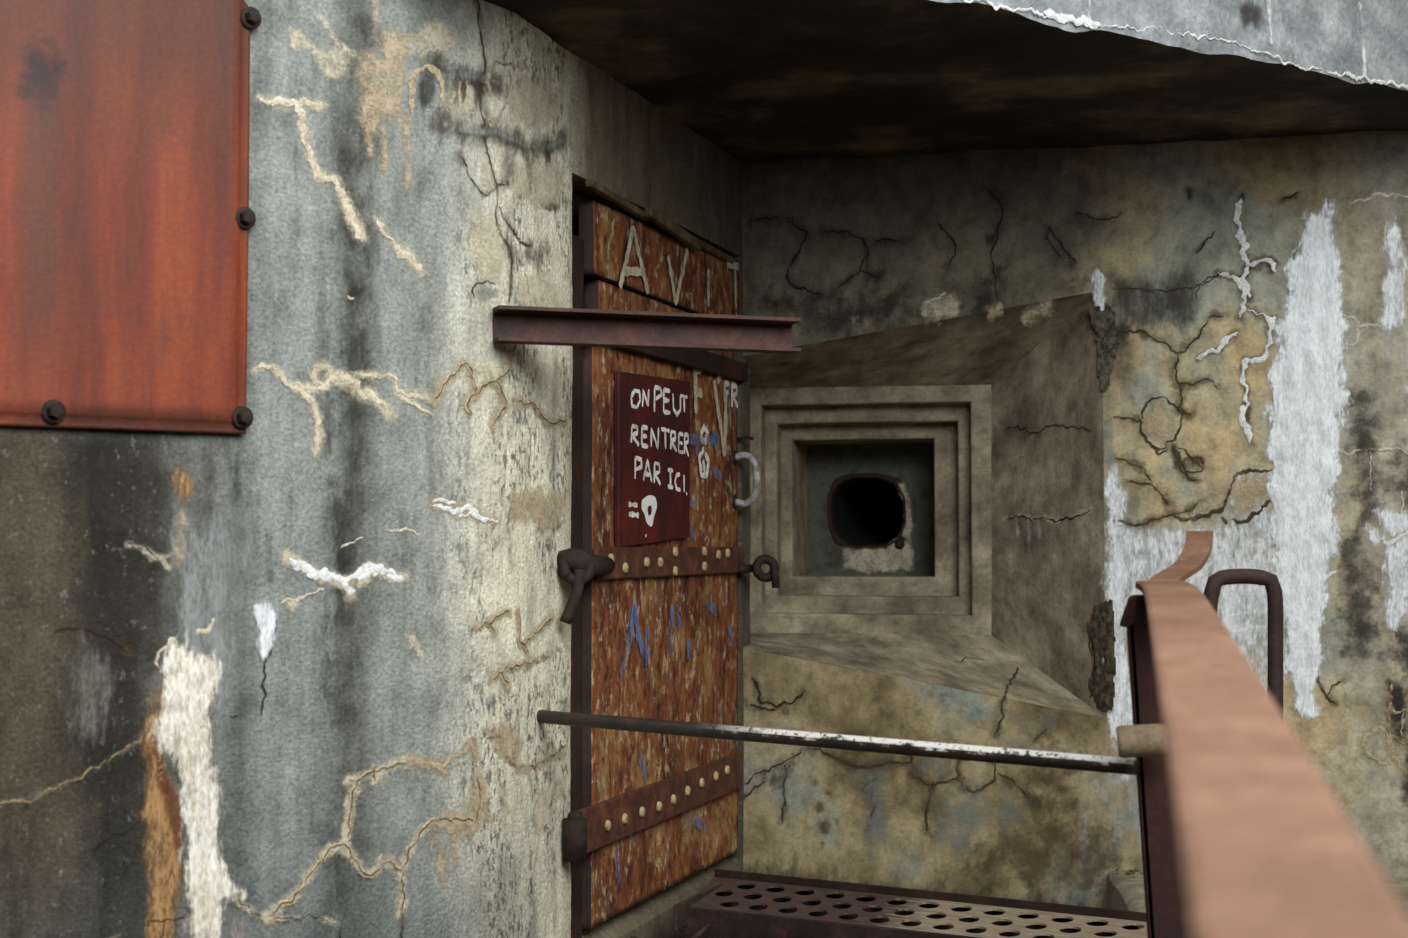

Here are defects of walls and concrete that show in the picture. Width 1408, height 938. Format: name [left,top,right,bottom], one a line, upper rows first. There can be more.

crack [750,216,898,294]
crack [937,220,956,267]
crack [986,189,1003,300]
crack [1046,212,1124,261]
water stain [1379,224,1407,330]
crack [1002,231,1223,527]
crack [0,729,149,808]
rust [143,686,186,938]
water stain [149,515,252,938]
crack [236,760,481,938]
crack [744,657,1040,833]